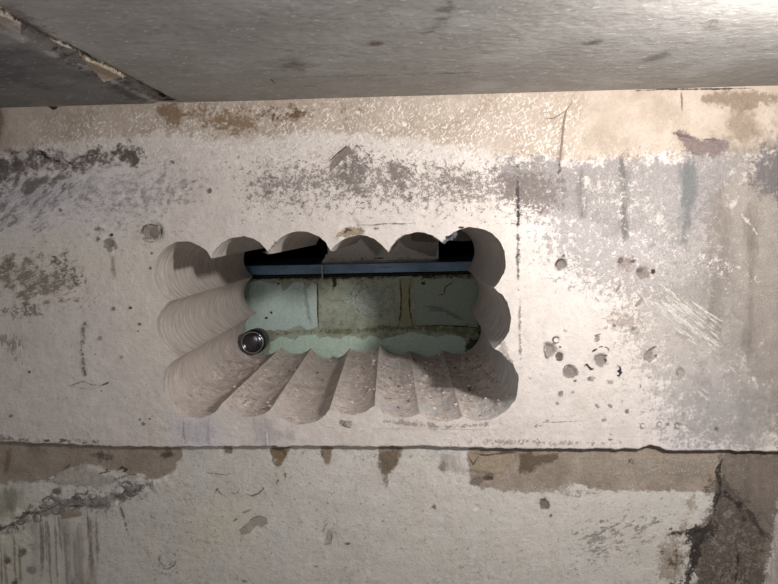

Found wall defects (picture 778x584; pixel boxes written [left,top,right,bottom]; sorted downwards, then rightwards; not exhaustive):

rust [157,102,305,135]
leakage [0,145,207,231]
leakage [0,241,90,322]
leakage [487,90,778,584]
spalling [270,447,290,481]
spalling [468,439,578,486]
crack [0,473,143,531]
peeling [233,510,268,535]